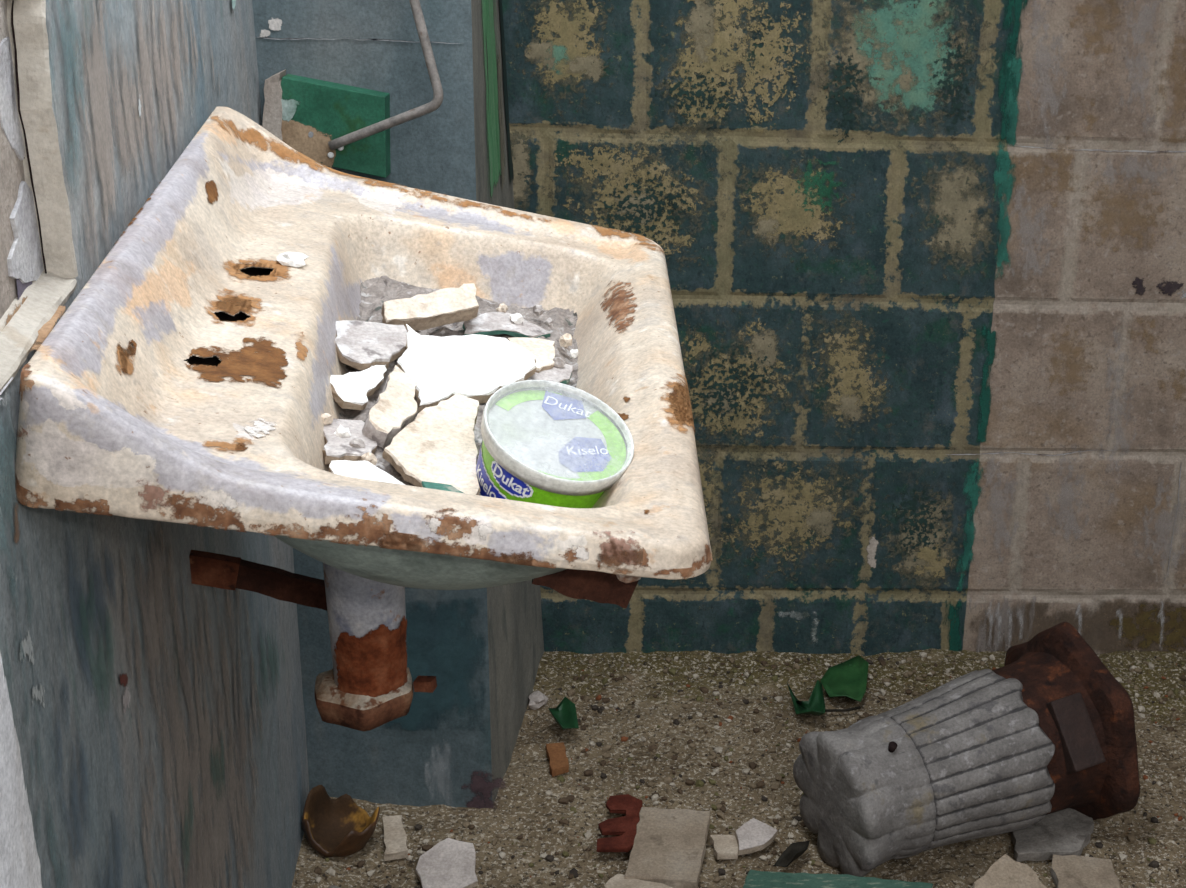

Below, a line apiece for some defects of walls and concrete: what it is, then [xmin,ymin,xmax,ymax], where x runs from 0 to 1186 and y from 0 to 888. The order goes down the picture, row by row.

crack [11,0,47,273]
peeling [510,0,1005,283]
peeling [678,298,966,608]
peeling [0,652,42,888]
spalling [19,630,35,665]
damp [972,597,1186,654]